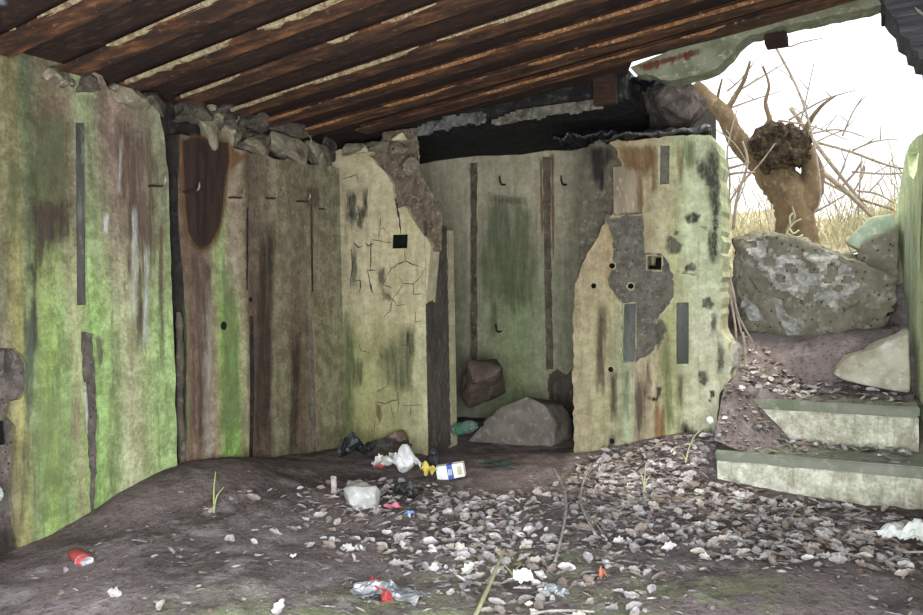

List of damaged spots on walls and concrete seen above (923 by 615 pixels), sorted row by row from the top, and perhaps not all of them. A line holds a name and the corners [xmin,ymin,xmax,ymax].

spalling [0,348,25,549]
damp [24,297,37,422]
damp [33,123,69,262]
damp [119,132,163,336]
damp [183,138,229,438]
crack [372,199,425,322]
spalling [372,99,603,454]
spalling [577,139,696,363]
peeling [686,152,720,261]
peeling [702,297,716,330]